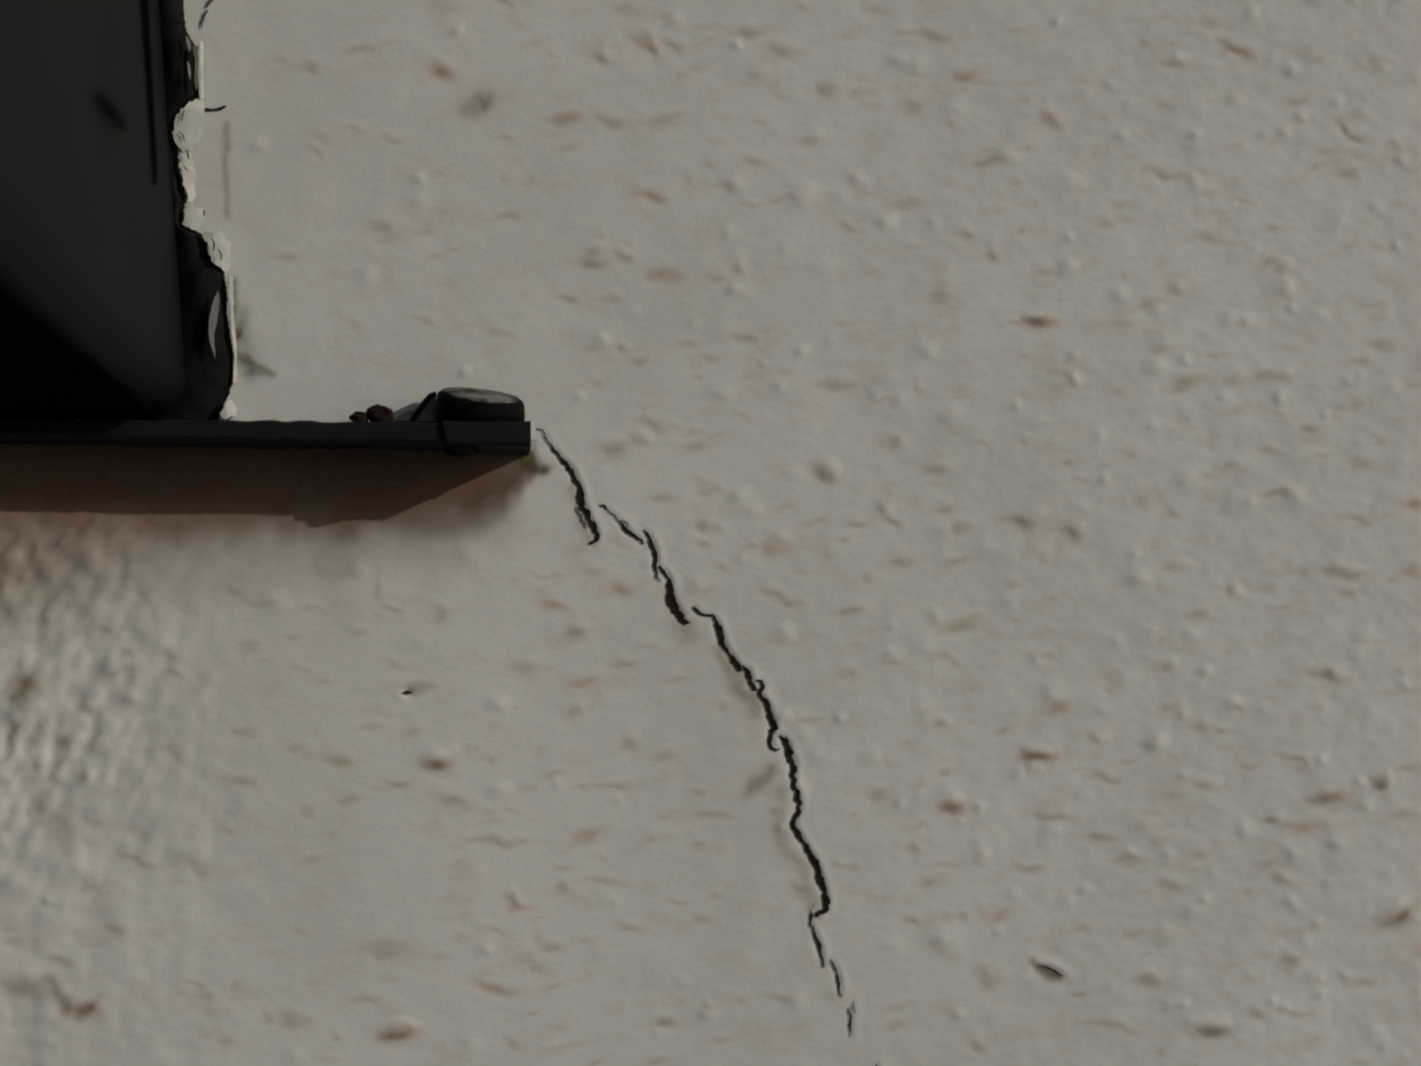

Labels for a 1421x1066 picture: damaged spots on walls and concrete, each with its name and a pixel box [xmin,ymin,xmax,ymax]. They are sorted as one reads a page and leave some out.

crack [536,428,856,1037]